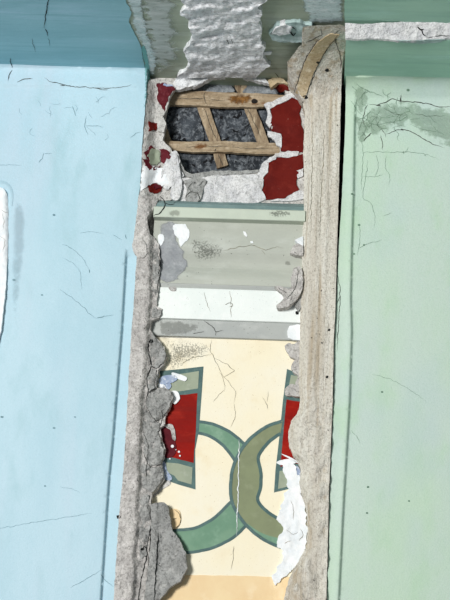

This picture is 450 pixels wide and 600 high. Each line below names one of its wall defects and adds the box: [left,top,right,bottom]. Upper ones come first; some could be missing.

crack [46,78,130,140]
crack [337,84,450,260]
crack [183,297,236,426]
spalling [114,0,450,600]